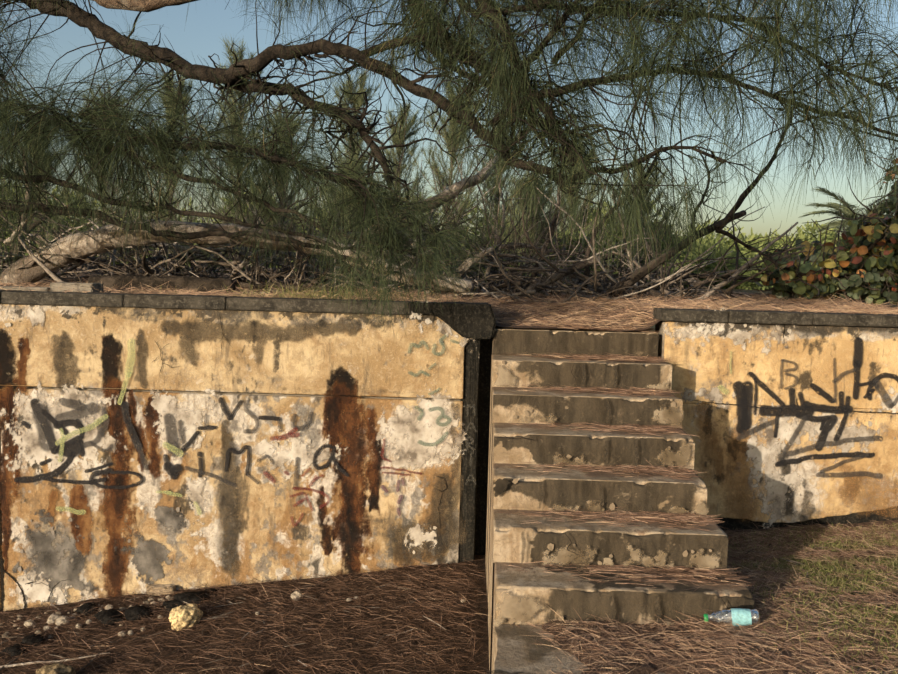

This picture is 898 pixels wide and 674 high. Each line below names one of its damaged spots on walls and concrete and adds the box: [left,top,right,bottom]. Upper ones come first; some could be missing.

leakage [51,332,80,394]
leakage [161,318,361,365]
rust [0,329,31,572]
rust [46,333,162,598]
leakage [219,420,248,575]
rust [316,367,383,575]
peeling [746,386,898,529]